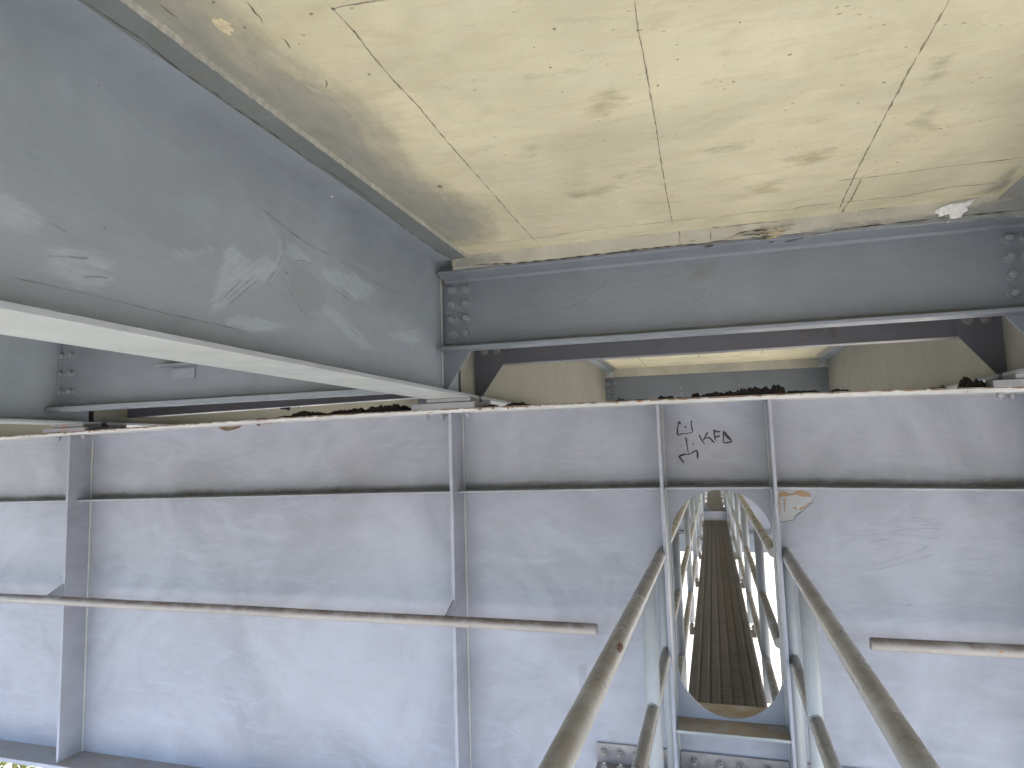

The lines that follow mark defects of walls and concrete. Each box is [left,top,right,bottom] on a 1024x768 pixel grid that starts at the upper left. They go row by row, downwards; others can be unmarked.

spalling [211,18,246,36]
crack [85,2,768,268]
crack [809,207,1017,236]
peeling [778,490,813,522]